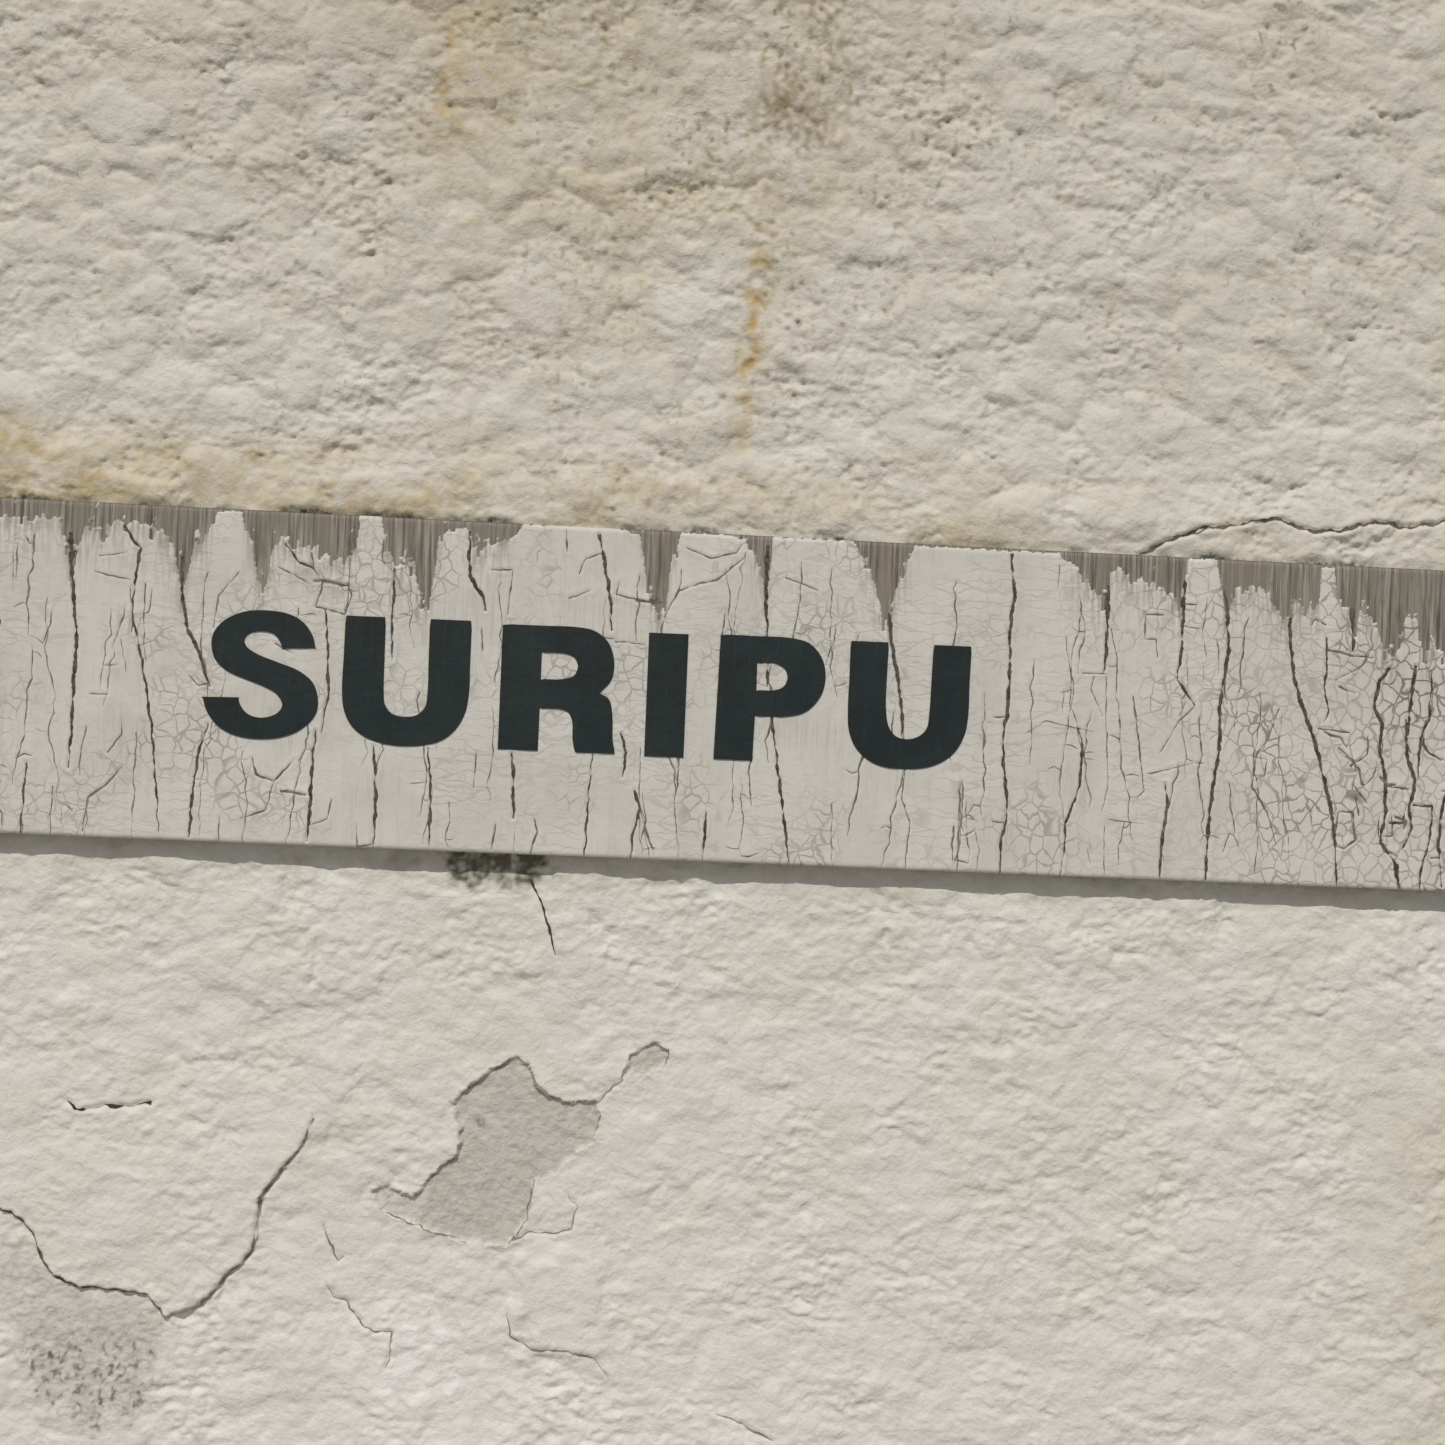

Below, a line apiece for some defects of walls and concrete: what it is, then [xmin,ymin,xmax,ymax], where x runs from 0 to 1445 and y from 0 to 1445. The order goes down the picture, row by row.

water stain [0,0,1445,571]
crack [1140,516,1445,555]
crack [530,880,556,955]
water stain [0,833,1444,927]
flaking render [370,1041,672,1248]
water stain [1268,976,1445,1445]